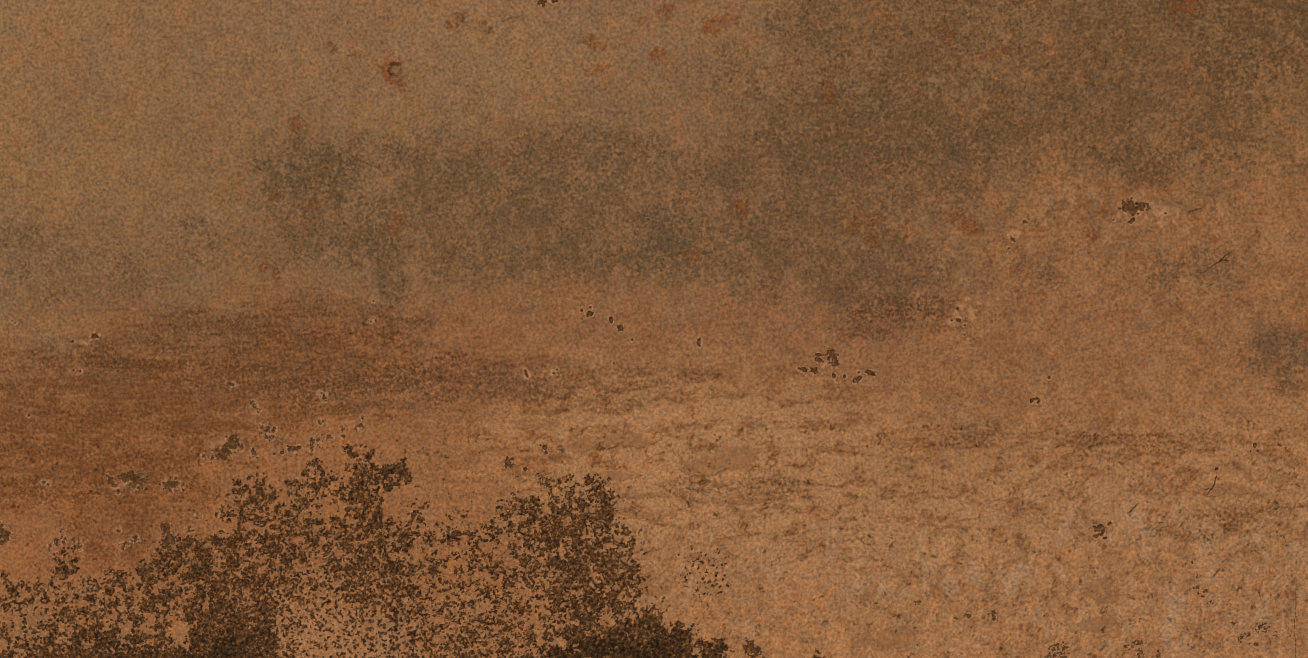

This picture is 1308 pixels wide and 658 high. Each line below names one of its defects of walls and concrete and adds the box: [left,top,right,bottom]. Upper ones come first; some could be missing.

spalling [1112,189,1180,229]
spalling [795,348,877,385]
corrosion [0,303,553,565]